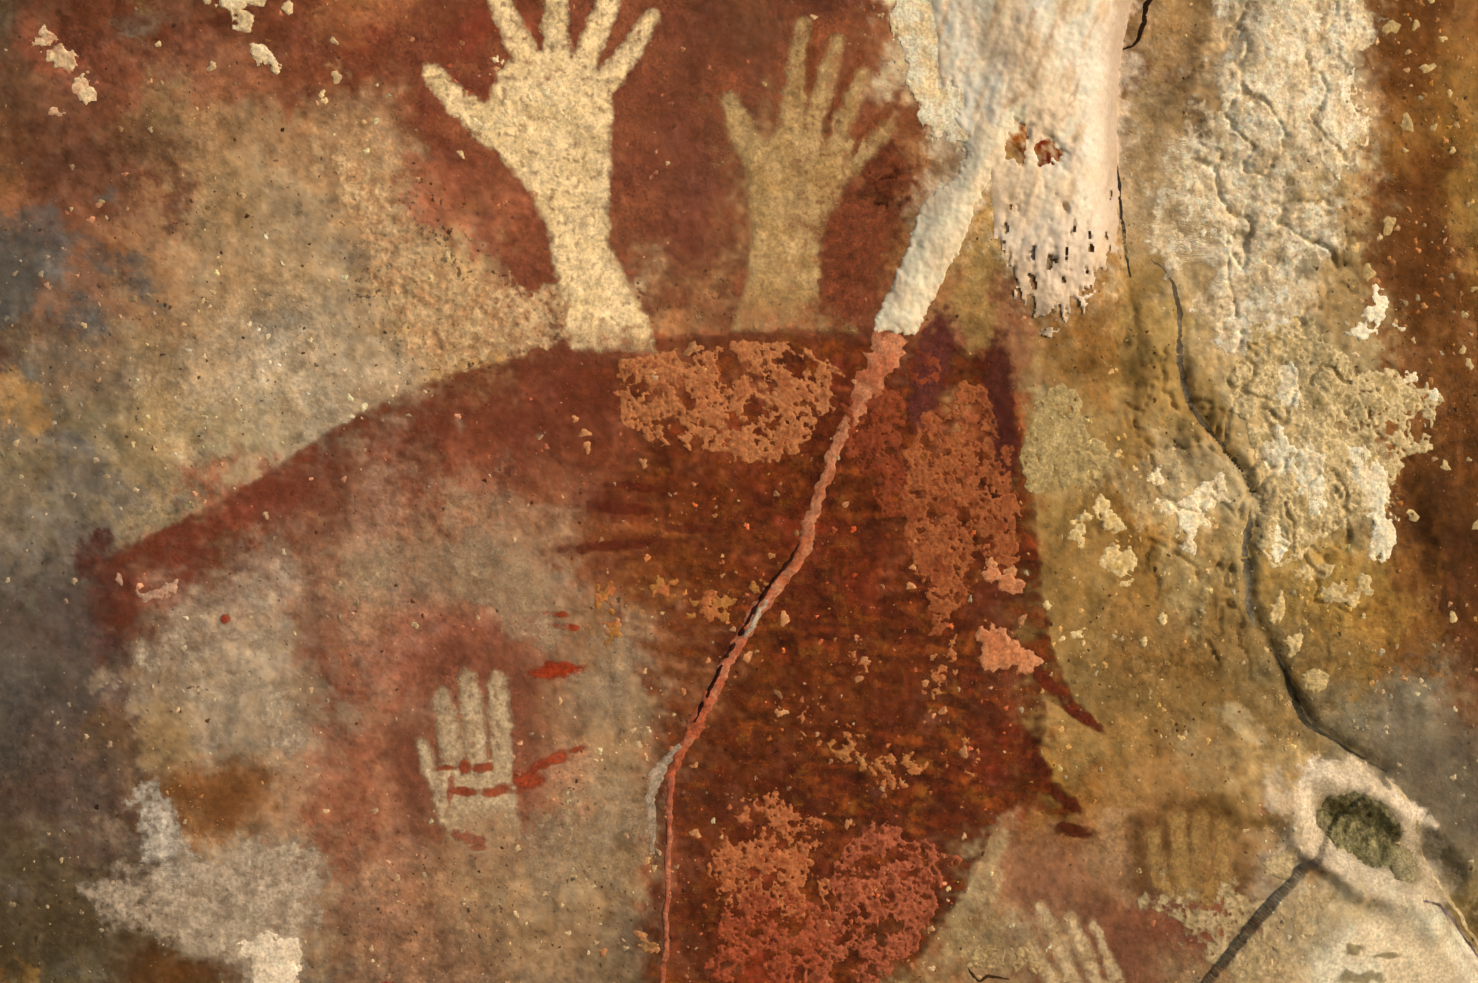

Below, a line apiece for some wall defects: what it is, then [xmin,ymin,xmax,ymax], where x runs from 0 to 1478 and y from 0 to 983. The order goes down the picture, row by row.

crack [1123,0,1153,50]
damp [1125,0,1375,361]
peeling [567,0,1478,726]
damp [1239,343,1394,532]
peeling [519,481,773,651]
crack [645,326,909,983]
crack [1117,166,1478,958]
peeling [816,731,996,795]
peeling [616,875,686,953]
peeling [689,791,1047,983]
peeling [1262,845,1299,883]